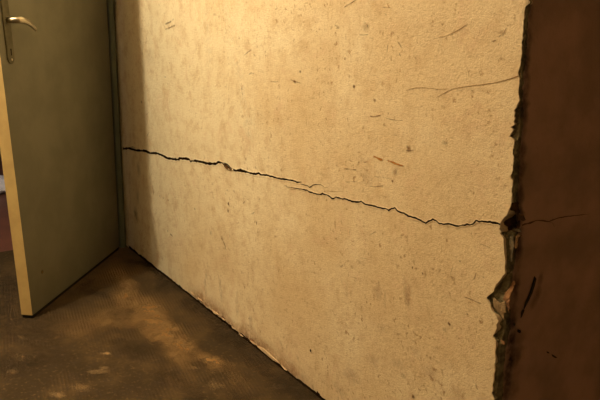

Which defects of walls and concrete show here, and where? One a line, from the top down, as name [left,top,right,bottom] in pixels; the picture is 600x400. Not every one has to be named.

crack [123,146,501,229]
flaking render [486,0,532,400]